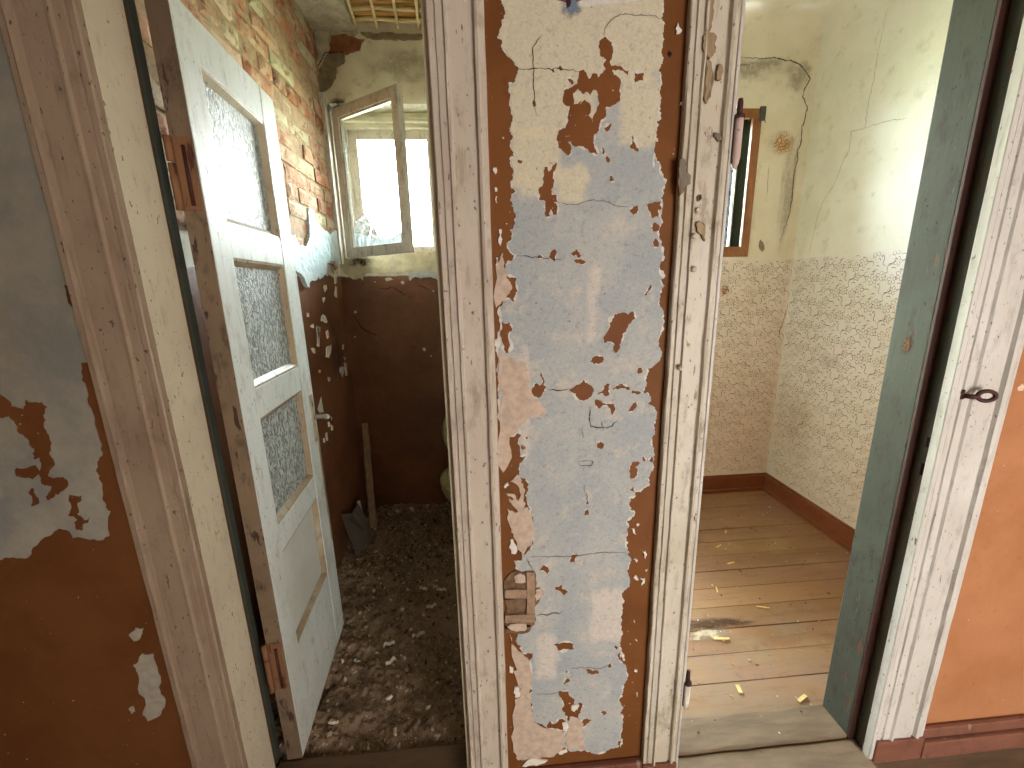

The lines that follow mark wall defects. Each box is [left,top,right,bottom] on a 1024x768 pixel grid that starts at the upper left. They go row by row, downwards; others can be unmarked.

peeling [0,27,111,560]
flaking render [135,0,187,231]
flaking render [180,0,437,381]
peeling [317,398,333,443]
crack [522,39,579,103]
peeling [494,0,691,767]
peeling [129,628,144,641]
peeling [129,653,166,721]